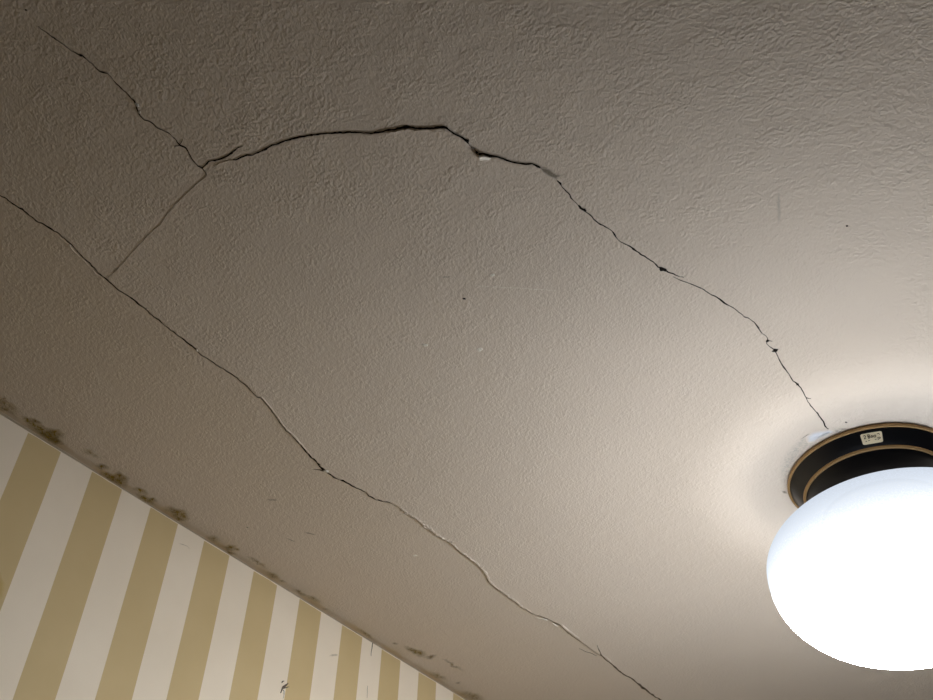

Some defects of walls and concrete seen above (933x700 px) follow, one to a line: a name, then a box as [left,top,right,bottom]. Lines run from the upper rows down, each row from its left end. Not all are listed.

damp [26,418,60,443]
crack [0,26,661,700]
crack [557,180,828,429]